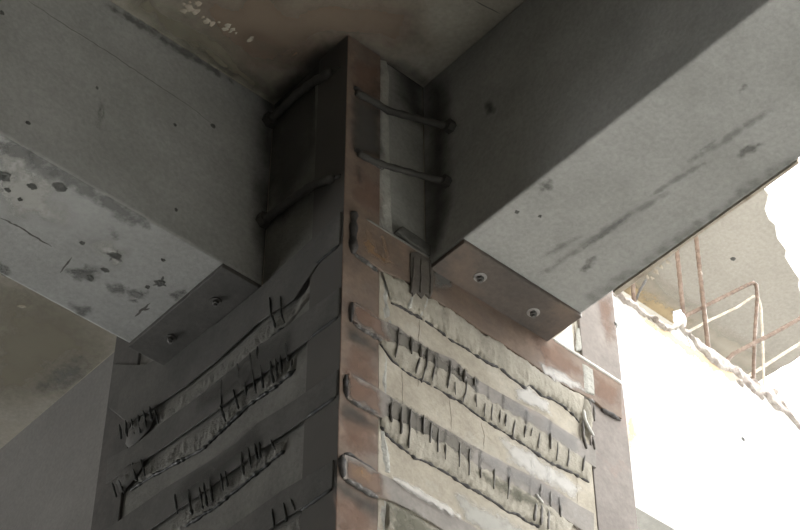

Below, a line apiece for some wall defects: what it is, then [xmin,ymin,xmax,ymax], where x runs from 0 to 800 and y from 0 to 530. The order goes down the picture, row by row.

damp [0,143,146,227]
crack [1,218,52,247]
spalling [612,236,800,430]